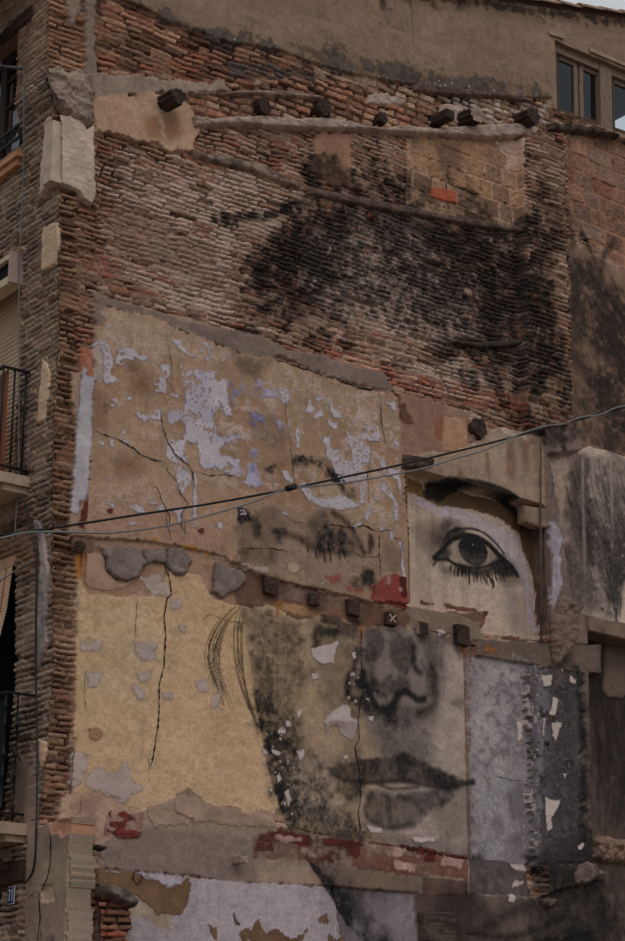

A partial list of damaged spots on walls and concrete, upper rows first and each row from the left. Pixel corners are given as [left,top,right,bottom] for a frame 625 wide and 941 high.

water stain [423,0,625,27]
peeling [70,336,408,610]
crack [96,328,231,782]
peeling [311,641,339,680]
peeling [541,670,576,686]
peeling [324,696,374,740]
peeling [542,697,562,741]
peeling [104,710,469,880]
peeling [545,796,560,831]
flaking render [94,867,191,916]
peeling [509,863,526,903]
flaking render [234,914,308,941]